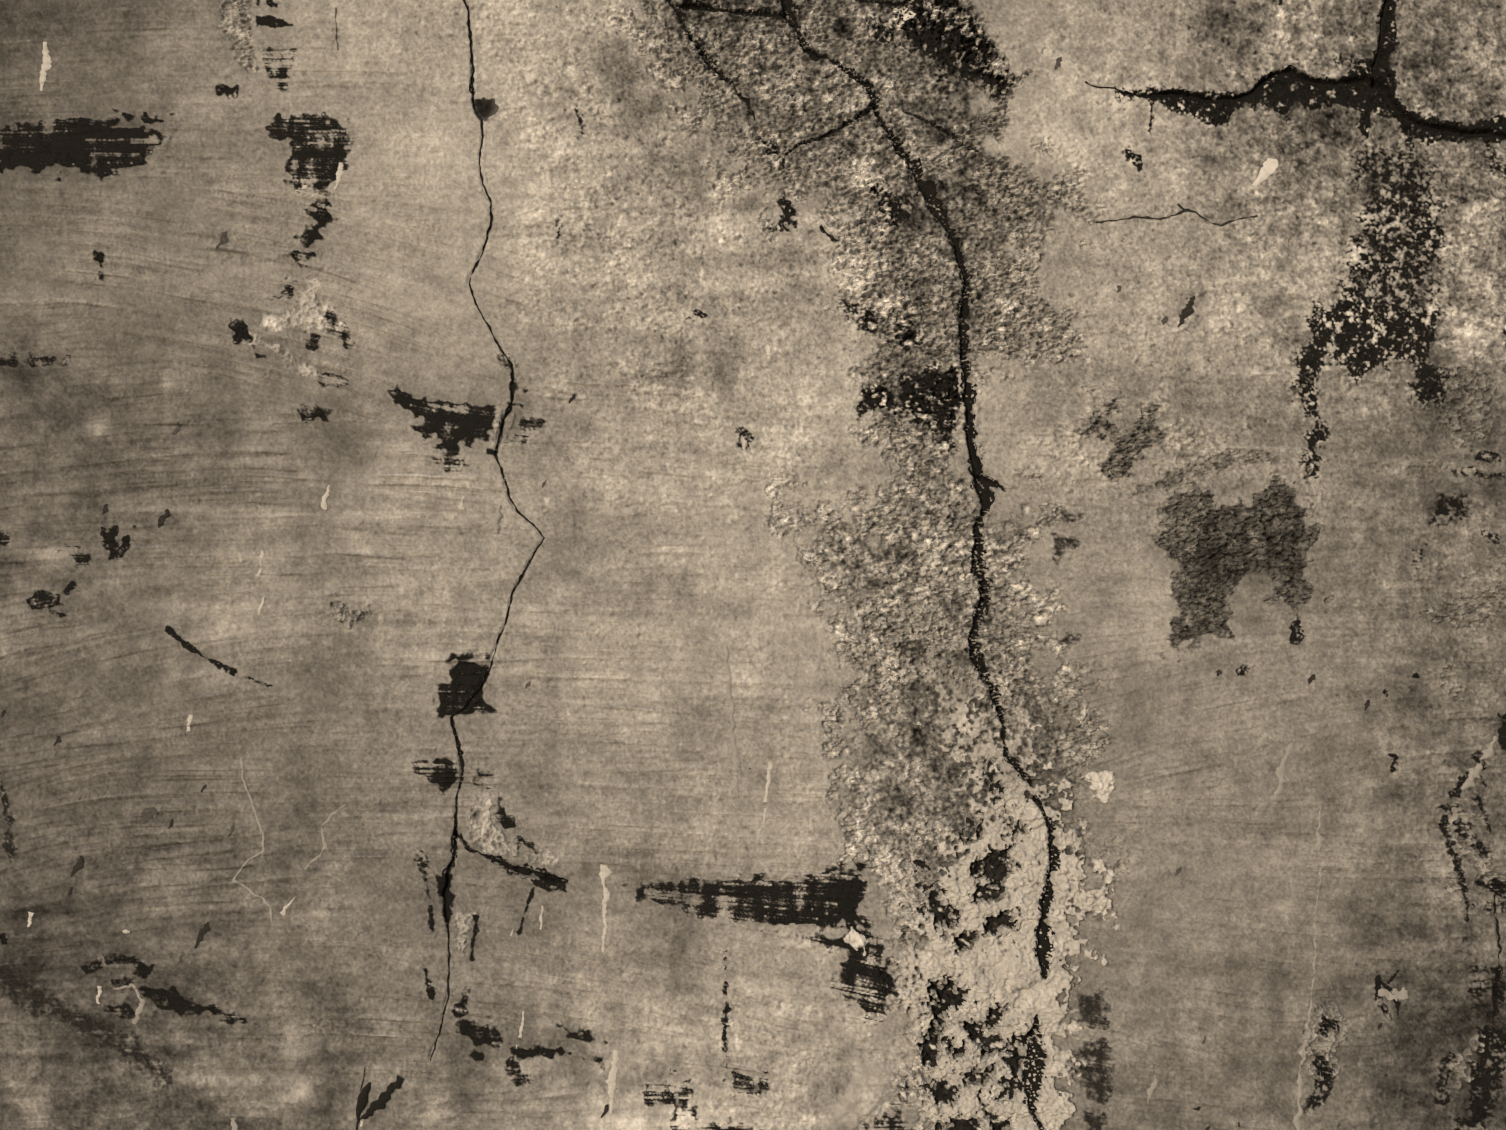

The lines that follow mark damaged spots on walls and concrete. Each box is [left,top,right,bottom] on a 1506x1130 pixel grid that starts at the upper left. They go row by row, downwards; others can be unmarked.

damp [867,0,1015,100]
crack [1085,0,1506,139]
damp [0,110,174,182]
damp [265,112,354,298]
damp [1115,0,1506,479]
damp [841,299,924,348]
damp [388,353,546,473]
damp [857,362,963,453]
crack [430,0,568,1061]
crack [665,0,1061,1130]
damp [437,653,497,718]
damp [623,608,1124,1130]